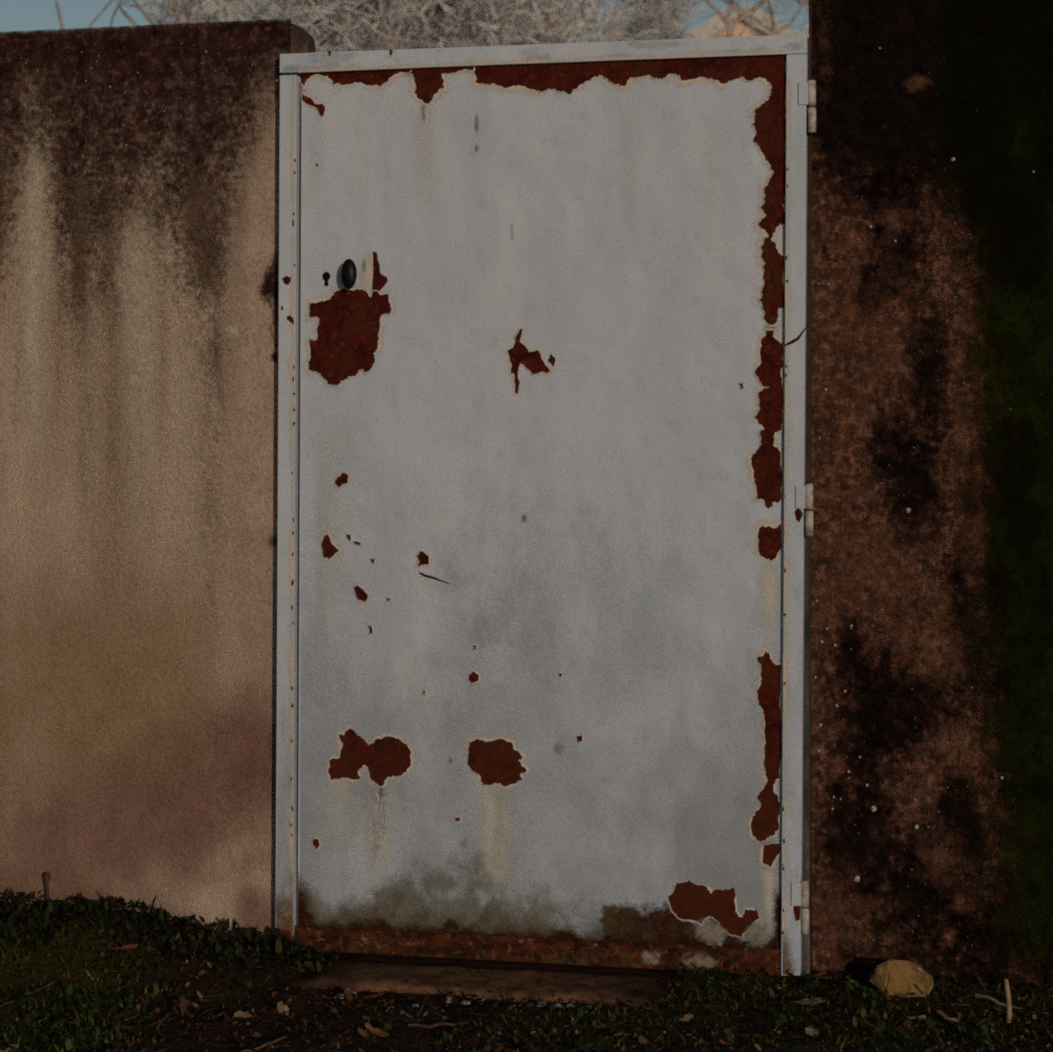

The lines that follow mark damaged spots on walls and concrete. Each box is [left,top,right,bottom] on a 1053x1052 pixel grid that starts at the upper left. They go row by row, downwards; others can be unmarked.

damp [949,0,1053,287]
rust [281,251,394,395]
damp [0,19,785,628]
rust [298,55,789,509]
rust [320,533,362,561]
rust [353,584,370,603]
rust [415,550,432,568]
rust [755,521,786,623]
rust [275,648,800,949]